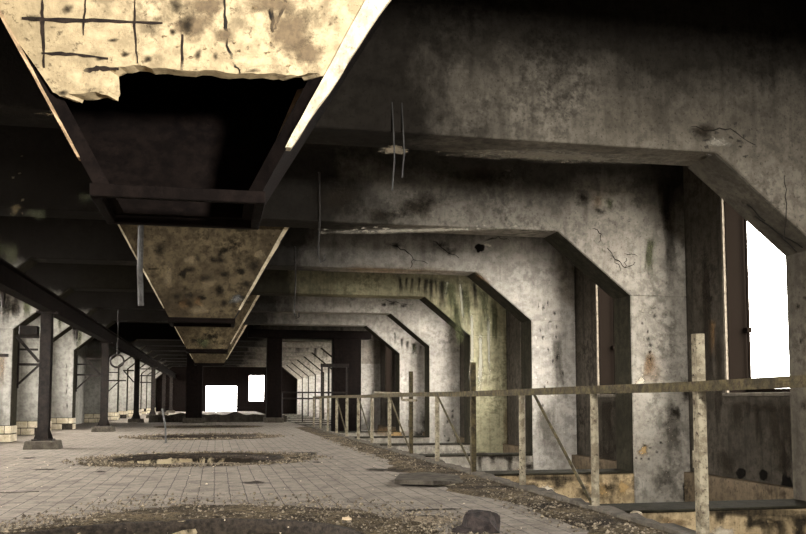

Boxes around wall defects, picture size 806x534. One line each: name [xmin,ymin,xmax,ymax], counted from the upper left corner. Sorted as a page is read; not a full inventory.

crack [269,0,287,33]
crack [22,0,163,73]
peeling [142,42,159,62]
crack [178,34,186,70]
peeling [184,48,207,69]
crack [223,0,241,73]
crack [593,228,637,271]
water stain [399,278,497,376]
spalling [113,453,285,464]
water stain [477,452,591,498]
spalling [20,518,365,534]
water stain [710,510,806,534]